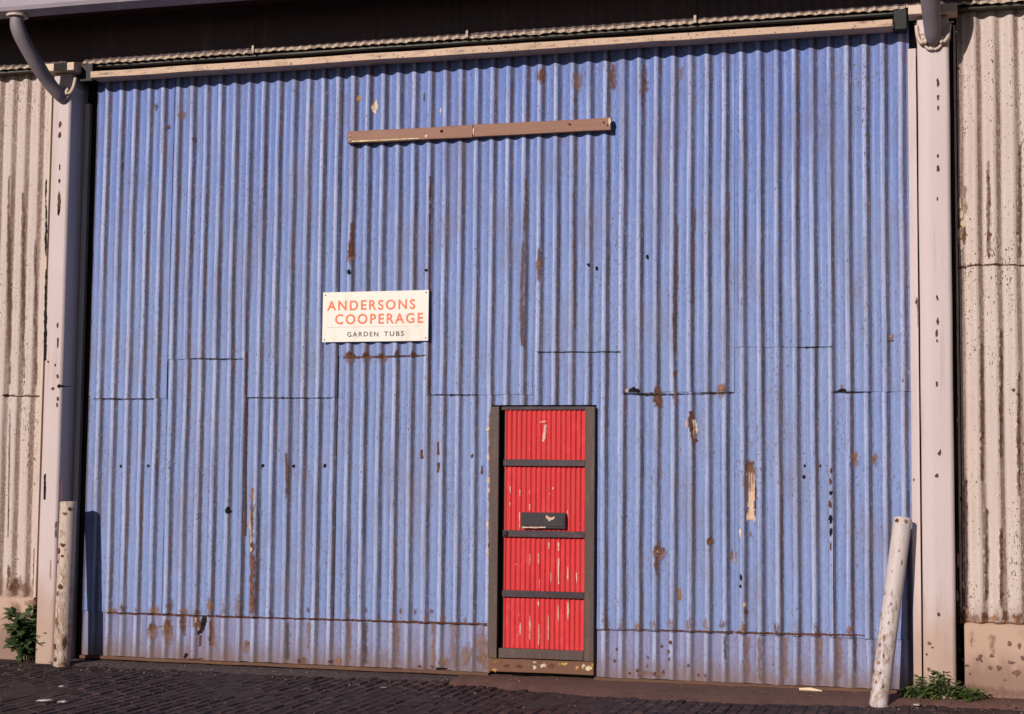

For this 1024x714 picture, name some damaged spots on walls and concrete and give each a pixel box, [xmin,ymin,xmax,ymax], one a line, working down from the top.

corrosion [343,176,477,396]
corrosion [519,179,527,345]
corrosion [106,352,490,672]
peeling [514,542,577,645]
corrosion [653,543,665,575]
spalling [959,641,1024,681]